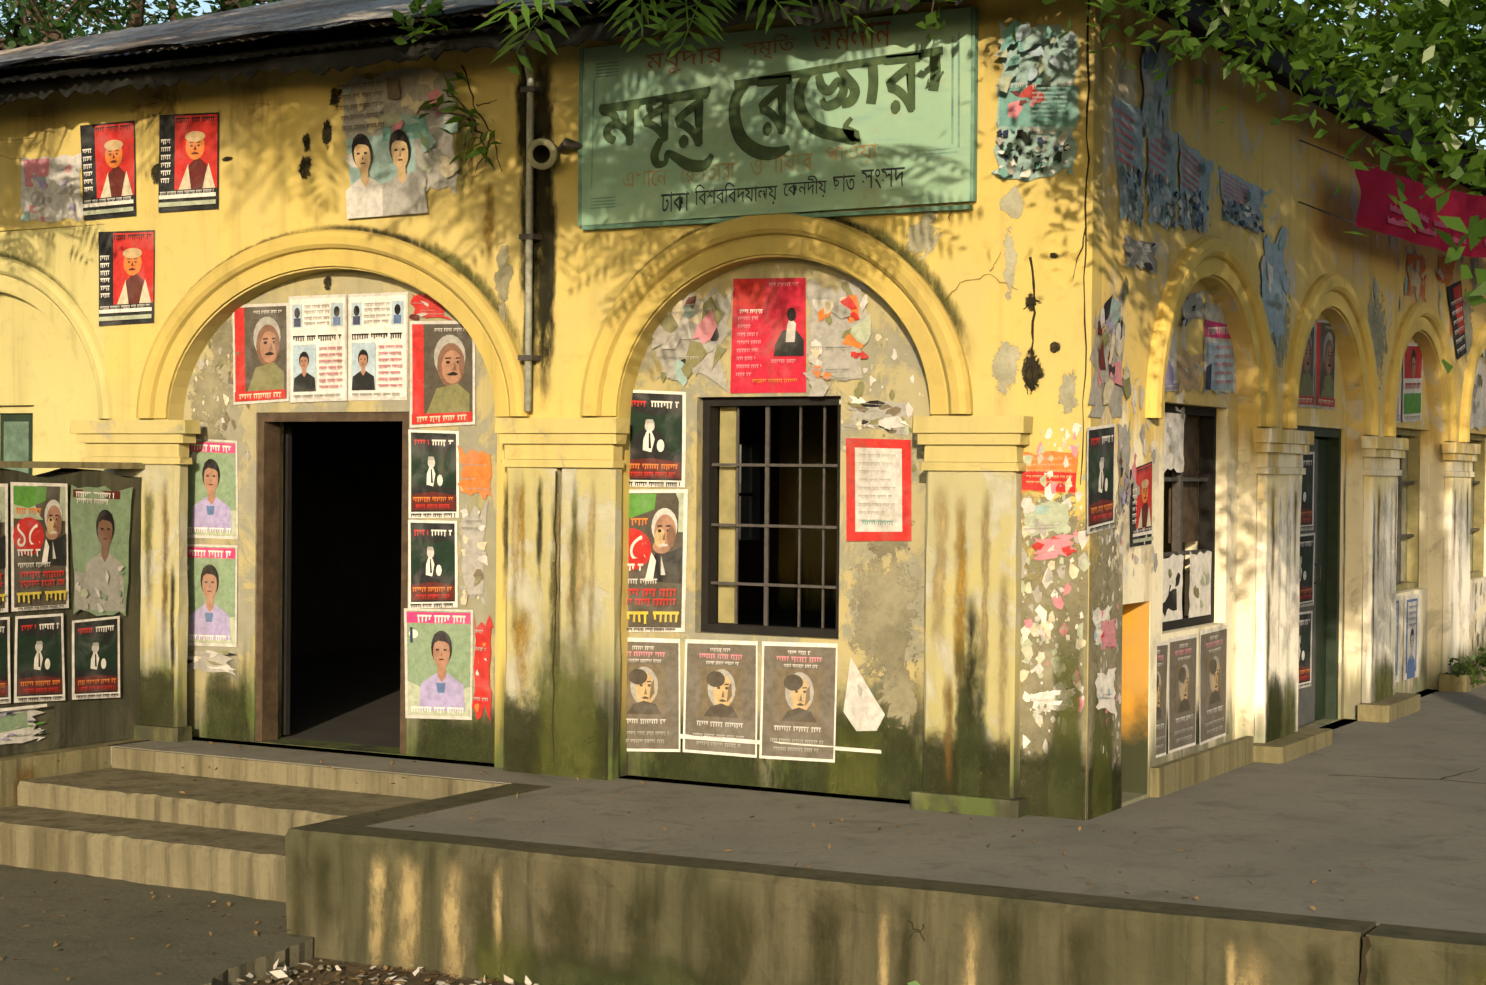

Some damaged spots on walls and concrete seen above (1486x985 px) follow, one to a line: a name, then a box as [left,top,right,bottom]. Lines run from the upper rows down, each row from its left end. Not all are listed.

leakage [332,63,556,367]
peeling [999,184,1025,300]
peeling [992,341,1021,396]
peeling [1058,370,1078,414]
leakage [502,485,595,670]